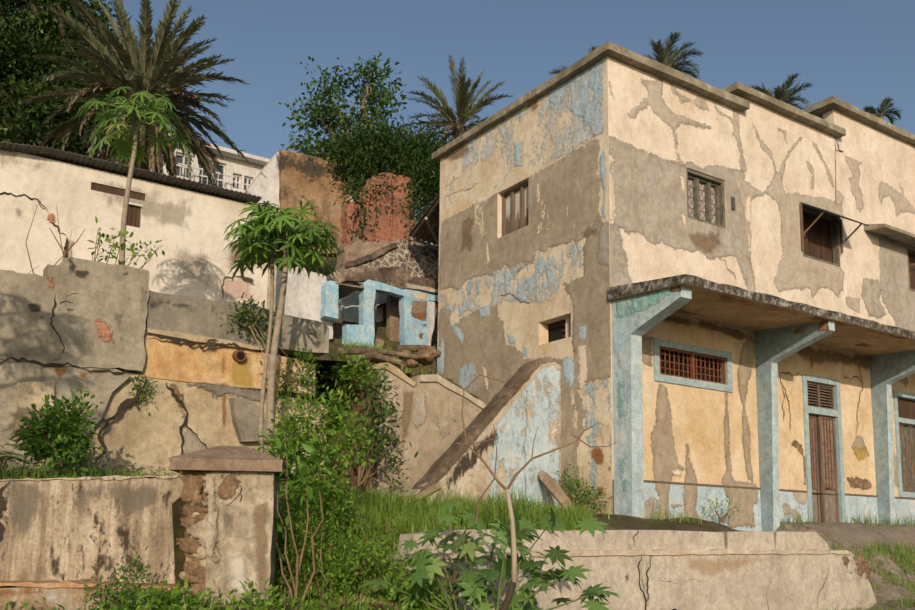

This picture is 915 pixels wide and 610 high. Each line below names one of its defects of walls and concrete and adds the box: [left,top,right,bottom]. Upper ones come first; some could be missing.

leakage [276,152,347,184]
crack [0,192,69,258]
flaking render [94,319,115,344]
peeling [438,78,915,529]
crack [0,293,207,463]
crack [0,481,11,542]
flaking render [178,470,205,506]
flaking render [217,471,241,500]
crack [633,529,706,610]